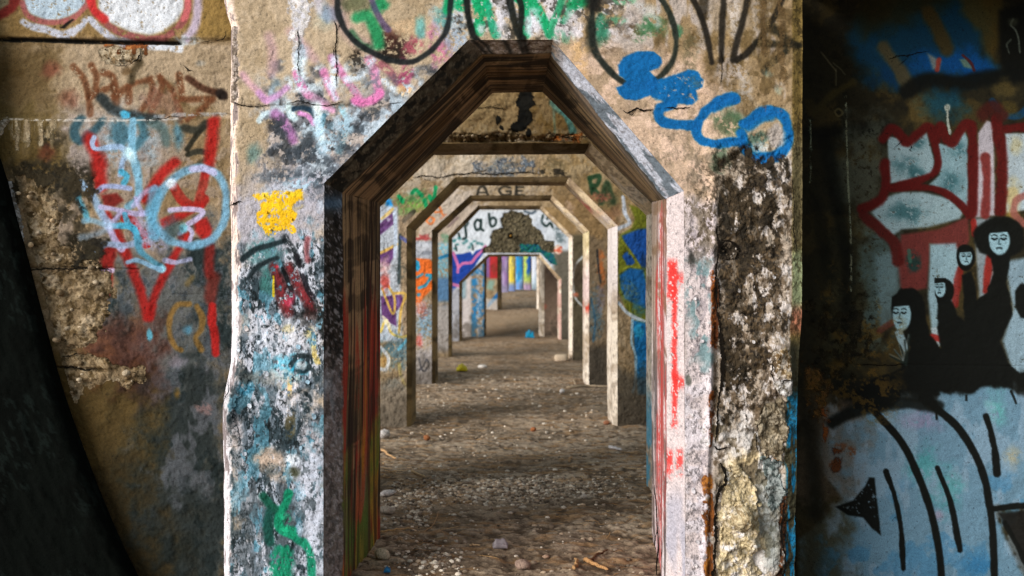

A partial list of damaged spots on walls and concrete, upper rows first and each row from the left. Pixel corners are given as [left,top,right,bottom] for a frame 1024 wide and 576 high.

crack [233,21,340,107]
spalling [444,129,574,142]
crack [623,107,689,115]
spalling [8,175,146,404]
crack [711,224,740,576]
water stain [711,144,794,433]
spalling [715,397,790,576]
spalling [772,347,792,381]